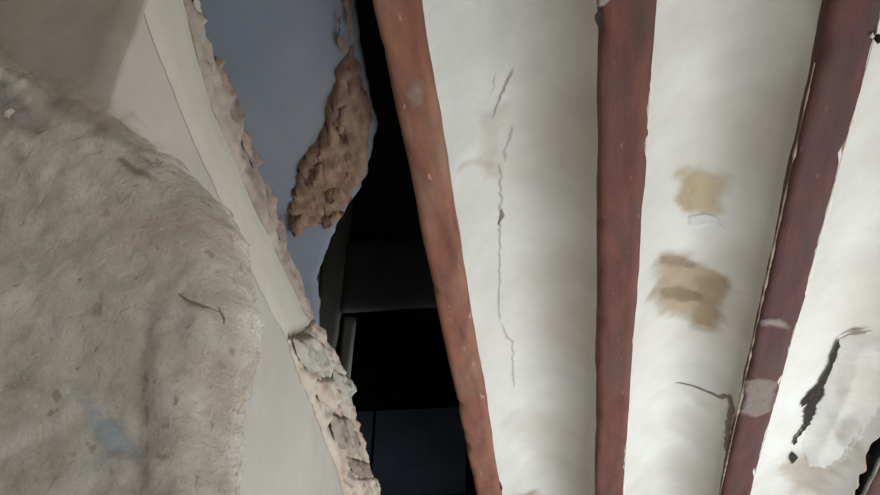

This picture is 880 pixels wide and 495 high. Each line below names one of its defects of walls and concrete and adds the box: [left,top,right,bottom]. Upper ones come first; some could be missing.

spalling [183,0,381,495]
damp [654,257,726,327]
crack [680,383,734,451]
crack [789,330,873,464]
crack [855,437,880,495]